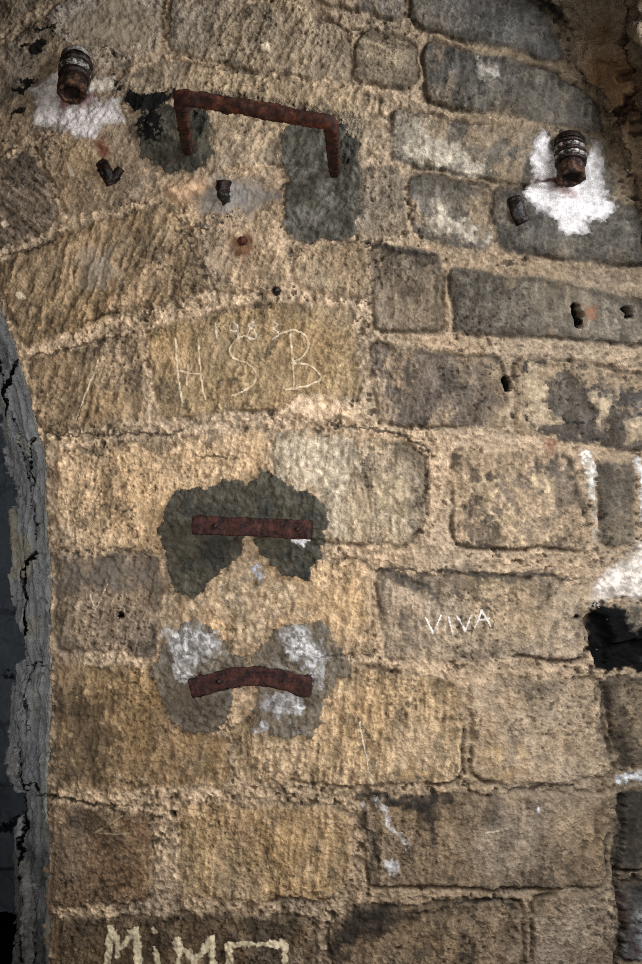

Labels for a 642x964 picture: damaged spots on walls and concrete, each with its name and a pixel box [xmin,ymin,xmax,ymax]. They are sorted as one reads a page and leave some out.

crack [536,0,568,28]
crack [60,430,168,438]
crack [0,311,118,636]
damp [590,544,642,608]